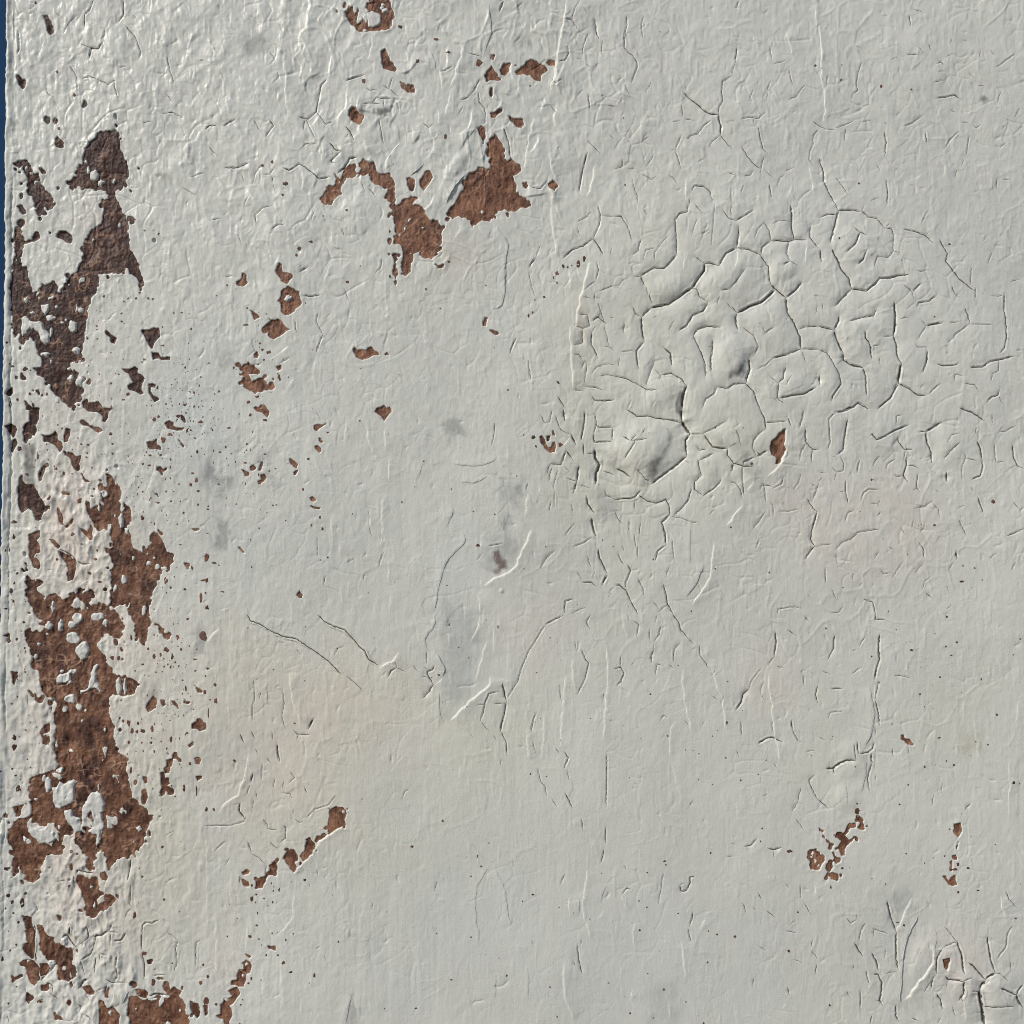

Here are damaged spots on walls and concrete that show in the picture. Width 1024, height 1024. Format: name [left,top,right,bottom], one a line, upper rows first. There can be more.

crack [542,0,651,112]
peeling [320,0,567,335]
peeling [250,223,302,339]
peeling [236,352,293,418]
crack [480,39,1022,830]
peeling [4,124,263,1024]
crack [247,614,434,698]
crack [206,678,335,882]
peeling [242,806,348,889]
peeling [807,815,865,897]
crack [743,884,817,972]
crack [847,892,1023,1024]